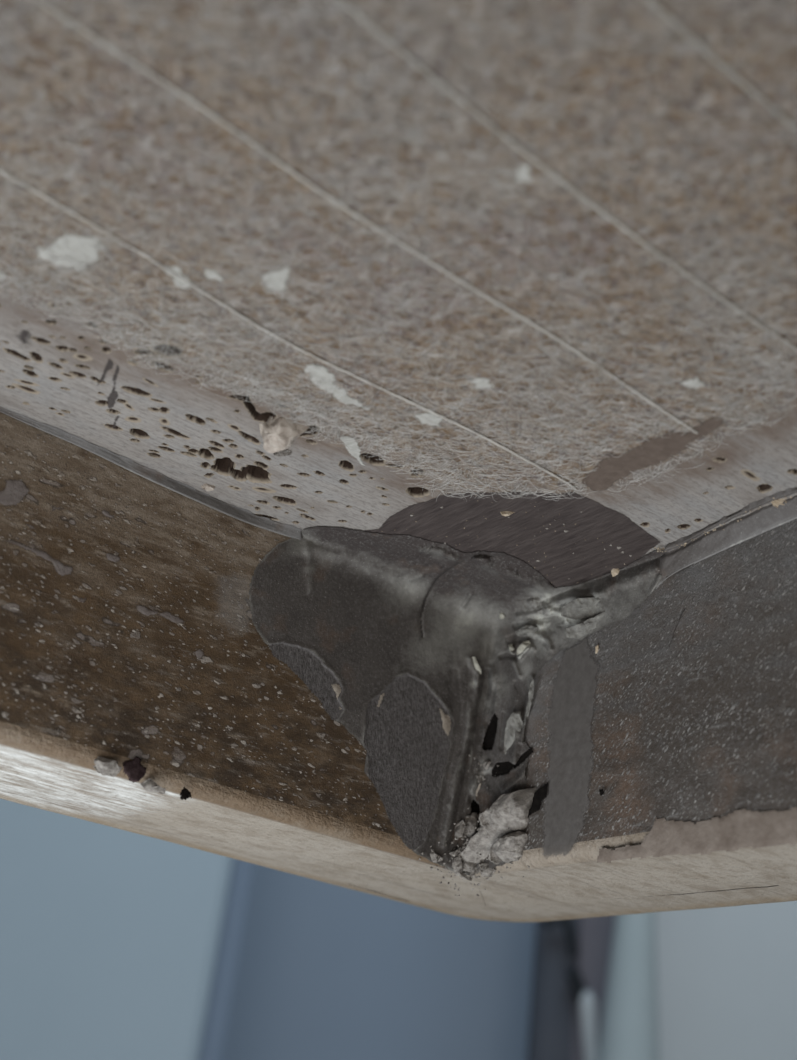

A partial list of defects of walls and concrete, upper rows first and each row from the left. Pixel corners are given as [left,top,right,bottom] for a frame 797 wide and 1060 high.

spalling [0,302,325,524]
damp [415,413,443,428]
spalling [314,453,430,523]
damp [365,416,723,588]
spalling [93,756,166,794]